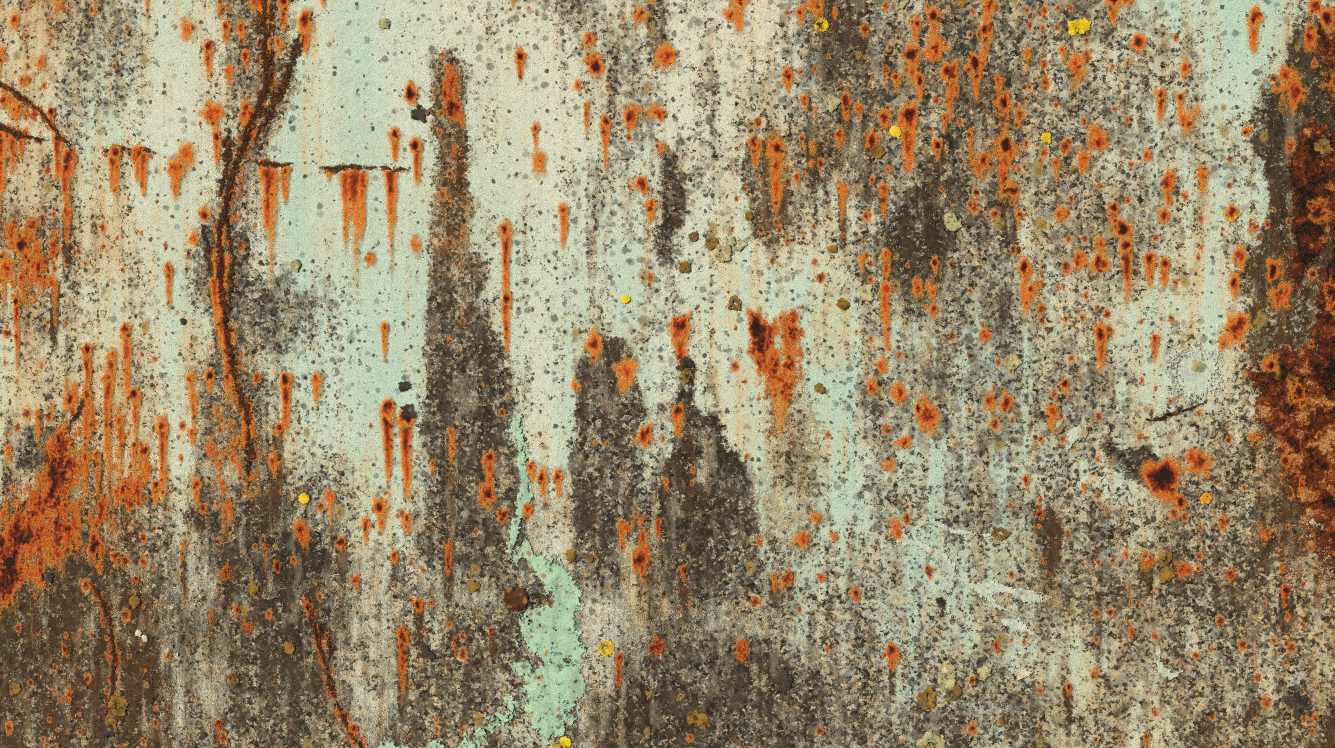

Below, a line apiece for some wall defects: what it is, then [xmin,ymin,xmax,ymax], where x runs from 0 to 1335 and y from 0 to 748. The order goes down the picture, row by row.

corrosion [199,97,254,166]
corrosion [181,0,325,84]
corrosion [574,31,666,166]
damp [636,0,671,79]
corrosion [1154,59,1201,132]
corrosion [745,0,1042,471]
corrosion [1072,201,1170,302]
damp [0,0,408,748]
damp [416,47,845,748]
corrosion [1217,0,1335,647]
corrosion [0,322,169,639]
corrosion [478,451,564,523]